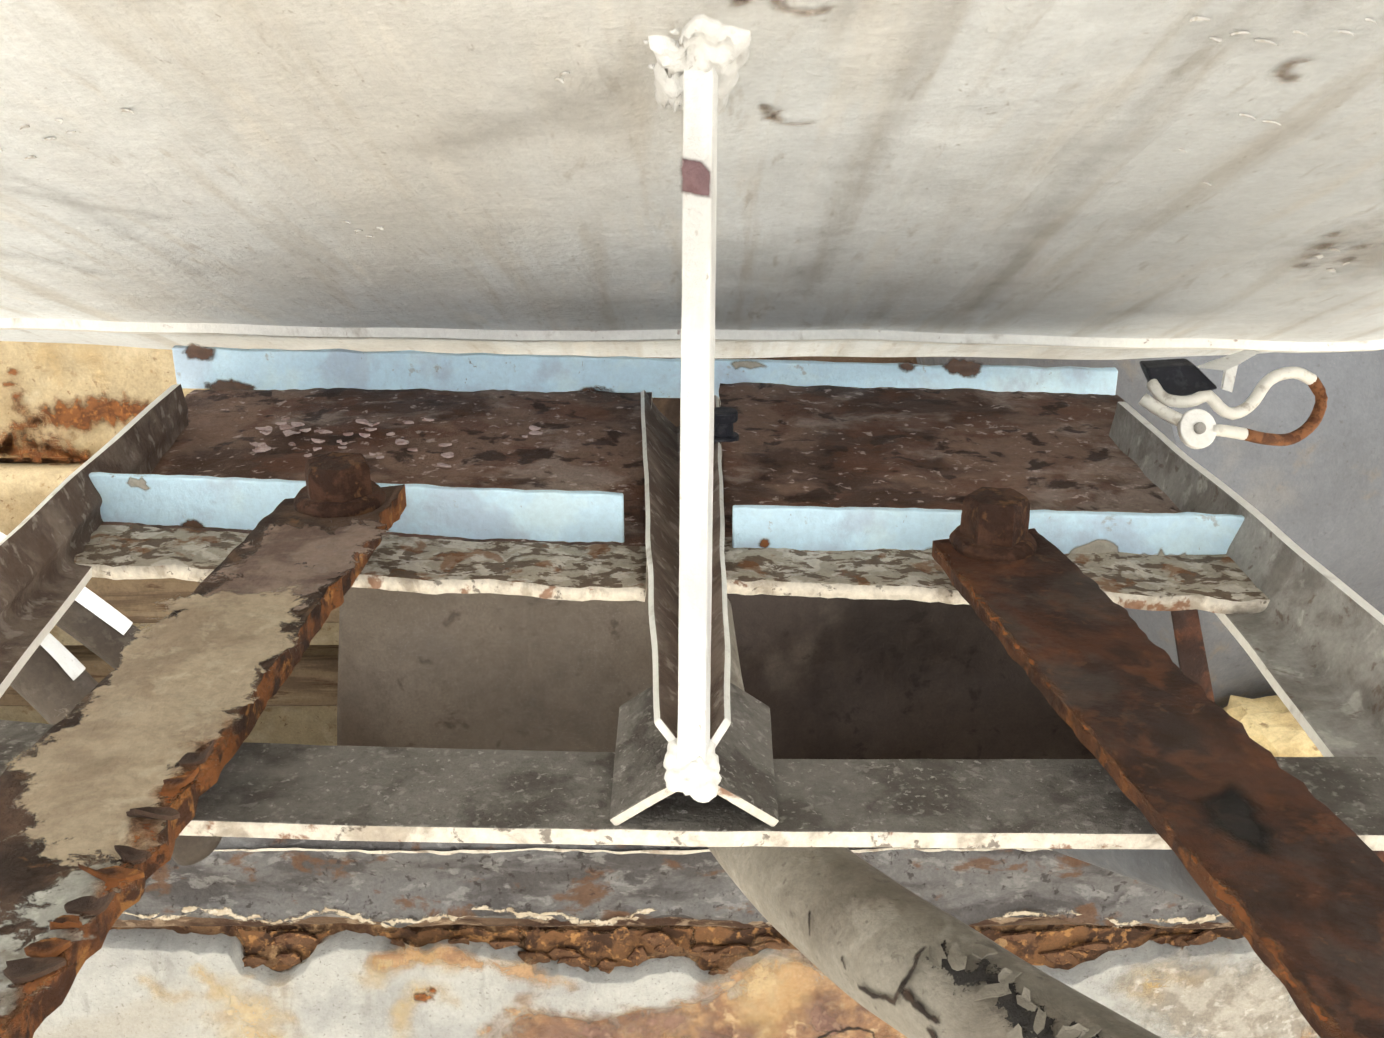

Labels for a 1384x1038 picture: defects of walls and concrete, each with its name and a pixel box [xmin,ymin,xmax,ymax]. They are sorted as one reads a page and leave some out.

rust [1277,62,1297,82]
rust [0,368,149,465]
rust [0,452,407,1038]
rust [932,487,1384,1038]
rust [414,988,436,1002]
rust [368,946,572,989]
rust [482,954,907,1038]
crack [841,947,940,1038]